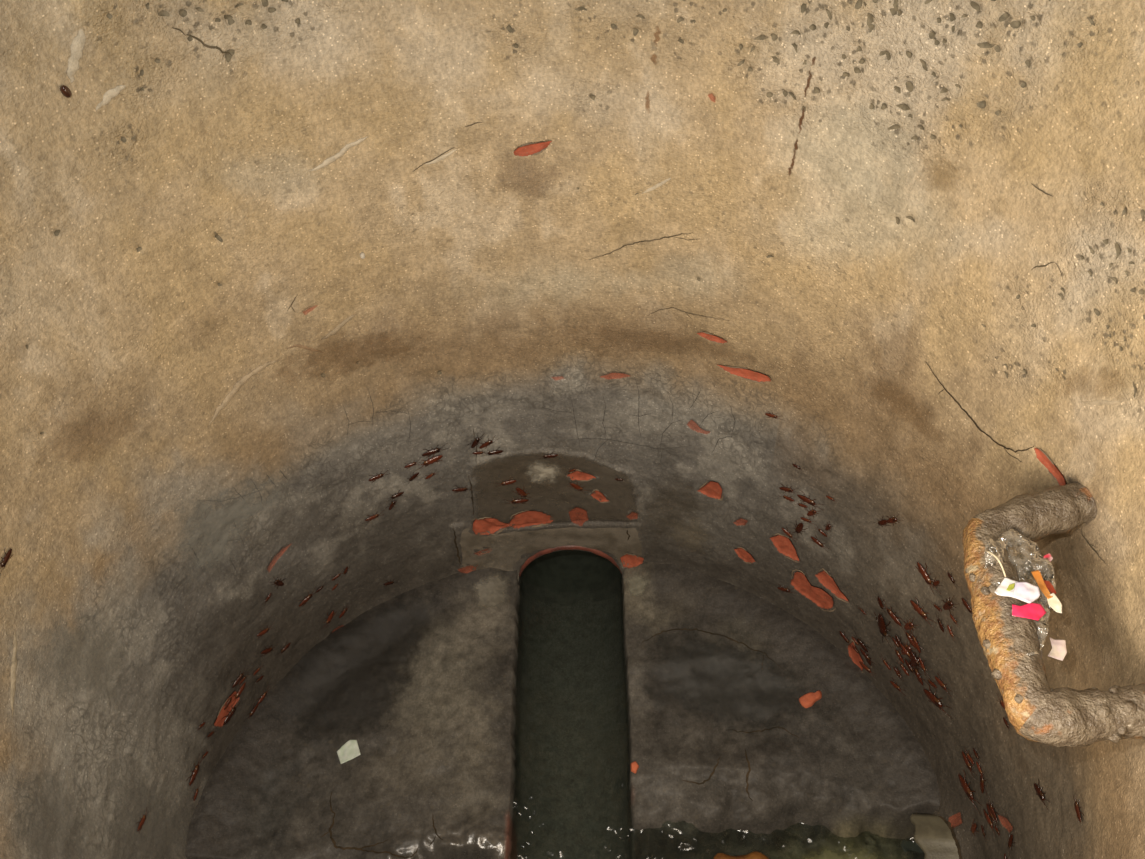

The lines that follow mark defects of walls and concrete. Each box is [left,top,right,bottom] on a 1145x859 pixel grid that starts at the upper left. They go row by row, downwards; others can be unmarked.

spalling [737,9,832,72]
spalling [514,141,552,156]
spalling [718,365,771,383]
crack [925,361,1034,462]
spalling [1034,447,1067,486]
spalling [567,470,609,503]
spalling [698,481,724,501]
spalling [472,511,553,536]
spalling [569,507,588,526]
spalling [620,553,644,569]
spalling [770,533,849,612]